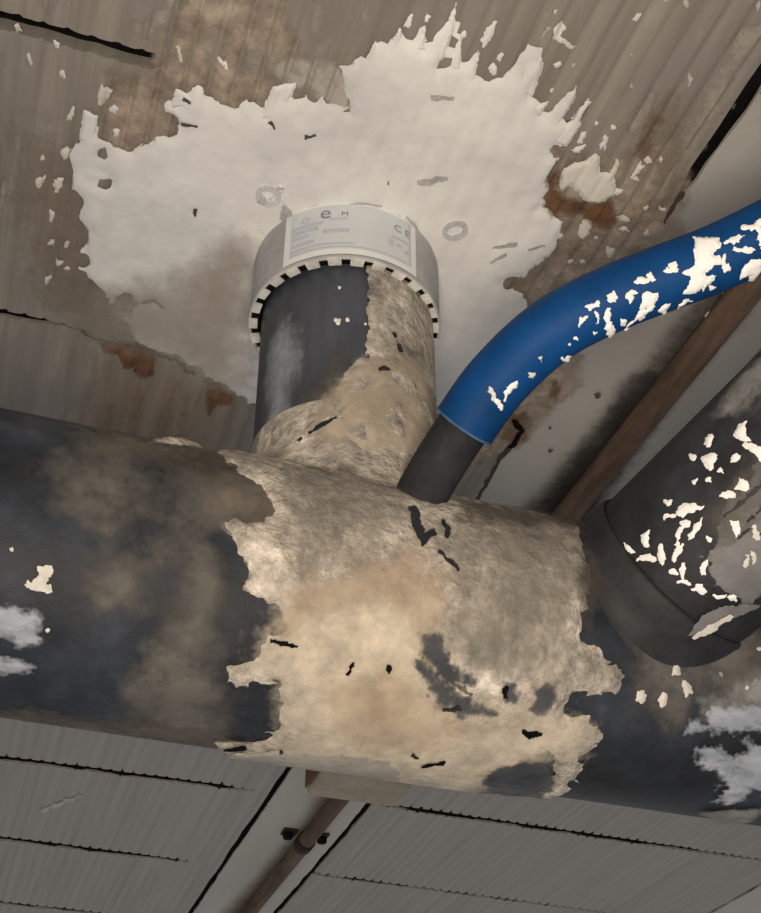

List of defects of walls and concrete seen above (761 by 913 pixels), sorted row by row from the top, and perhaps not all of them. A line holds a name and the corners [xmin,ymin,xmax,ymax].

crack [0,11,153,58]
water stain [98,0,299,152]
crack [663,64,761,224]
spalling [280,205,292,222]
spalling [417,176,448,186]
corrosion [546,174,616,229]
spalling [490,243,518,264]
crack [0,309,196,376]
corrosion [101,342,156,374]
corrosion [206,382,233,416]